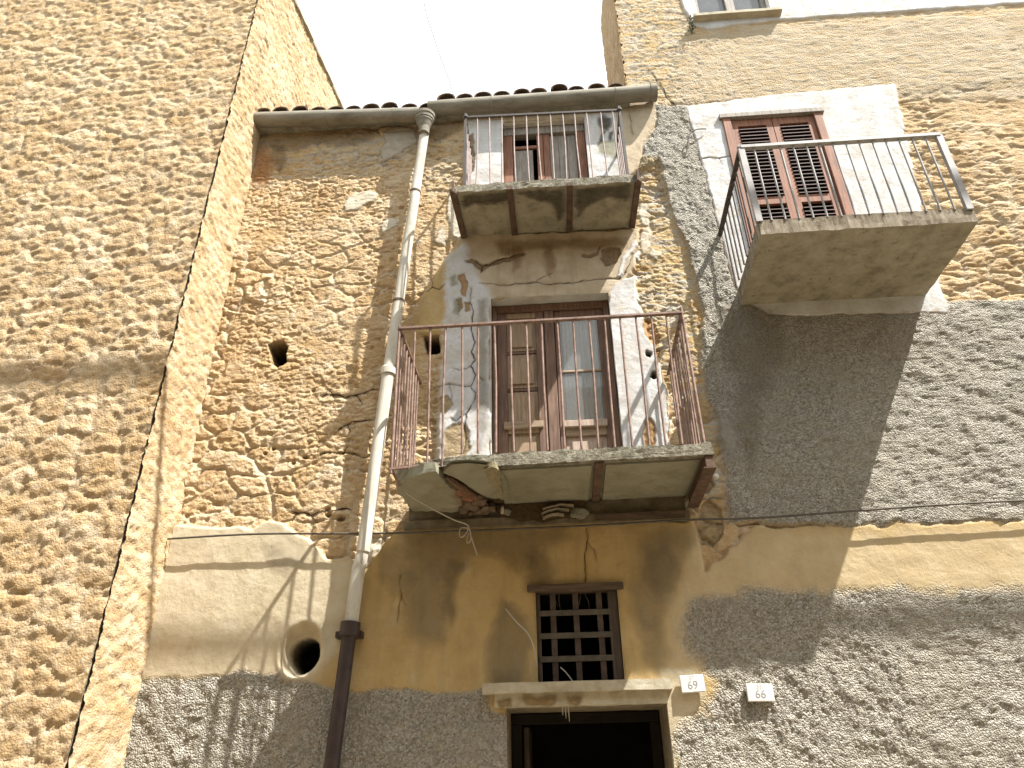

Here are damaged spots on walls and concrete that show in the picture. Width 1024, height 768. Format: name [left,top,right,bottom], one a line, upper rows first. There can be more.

damp [463,185,630,220]
crack [431,254,633,449]
crack [319,387,378,458]
spalling [440,396,453,414]
spalling [439,423,590,523]